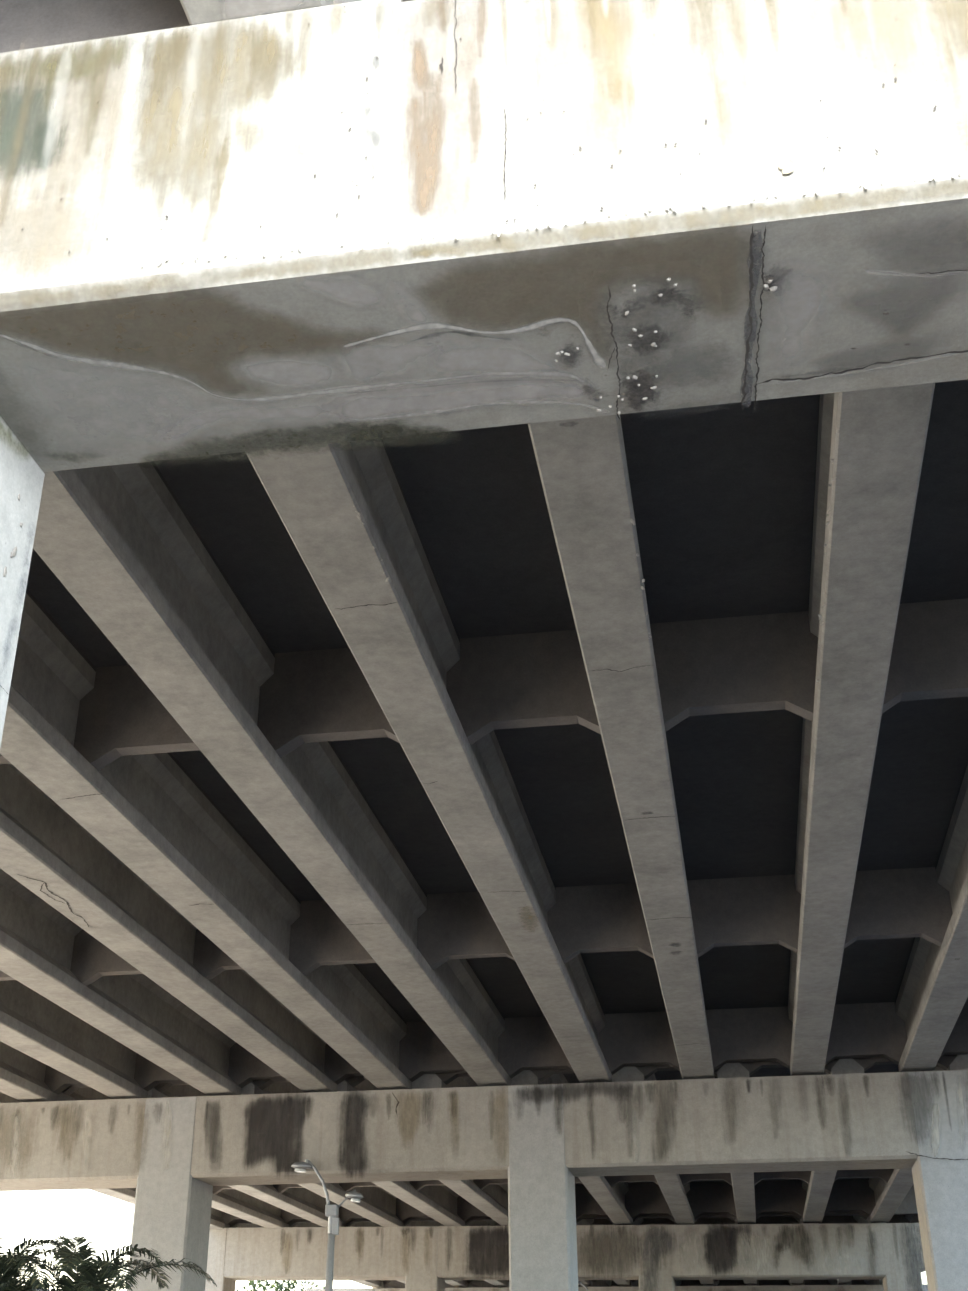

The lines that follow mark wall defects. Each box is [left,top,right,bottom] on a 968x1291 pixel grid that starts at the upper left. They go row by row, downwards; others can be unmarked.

water stain [31,28,278,178]
crack [741,226,968,413]